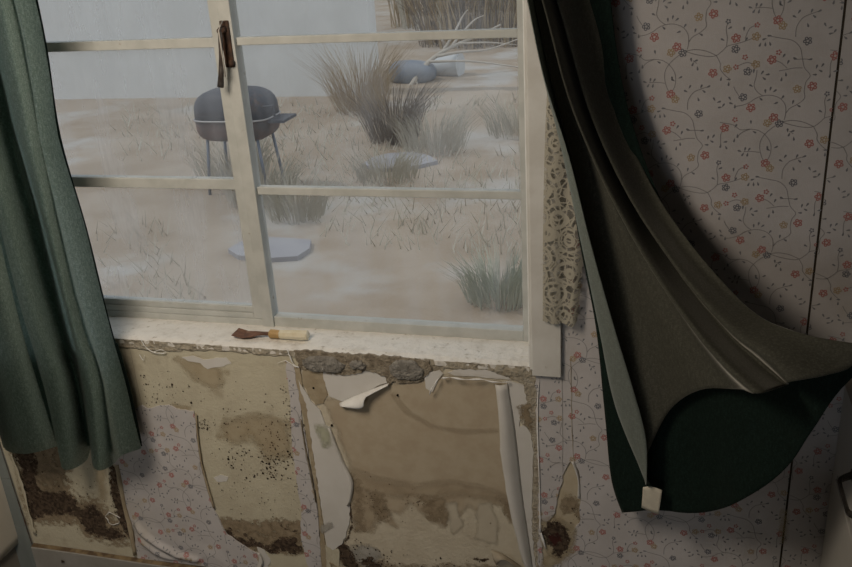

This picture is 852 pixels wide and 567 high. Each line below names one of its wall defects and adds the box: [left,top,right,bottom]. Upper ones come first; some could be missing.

damp [140,355,236,410]
peeling [0,438,138,558]
damp [9,447,131,548]
damp [197,385,304,556]
peeling [115,339,581,567]
damp [323,374,512,567]
damp [535,493,580,567]